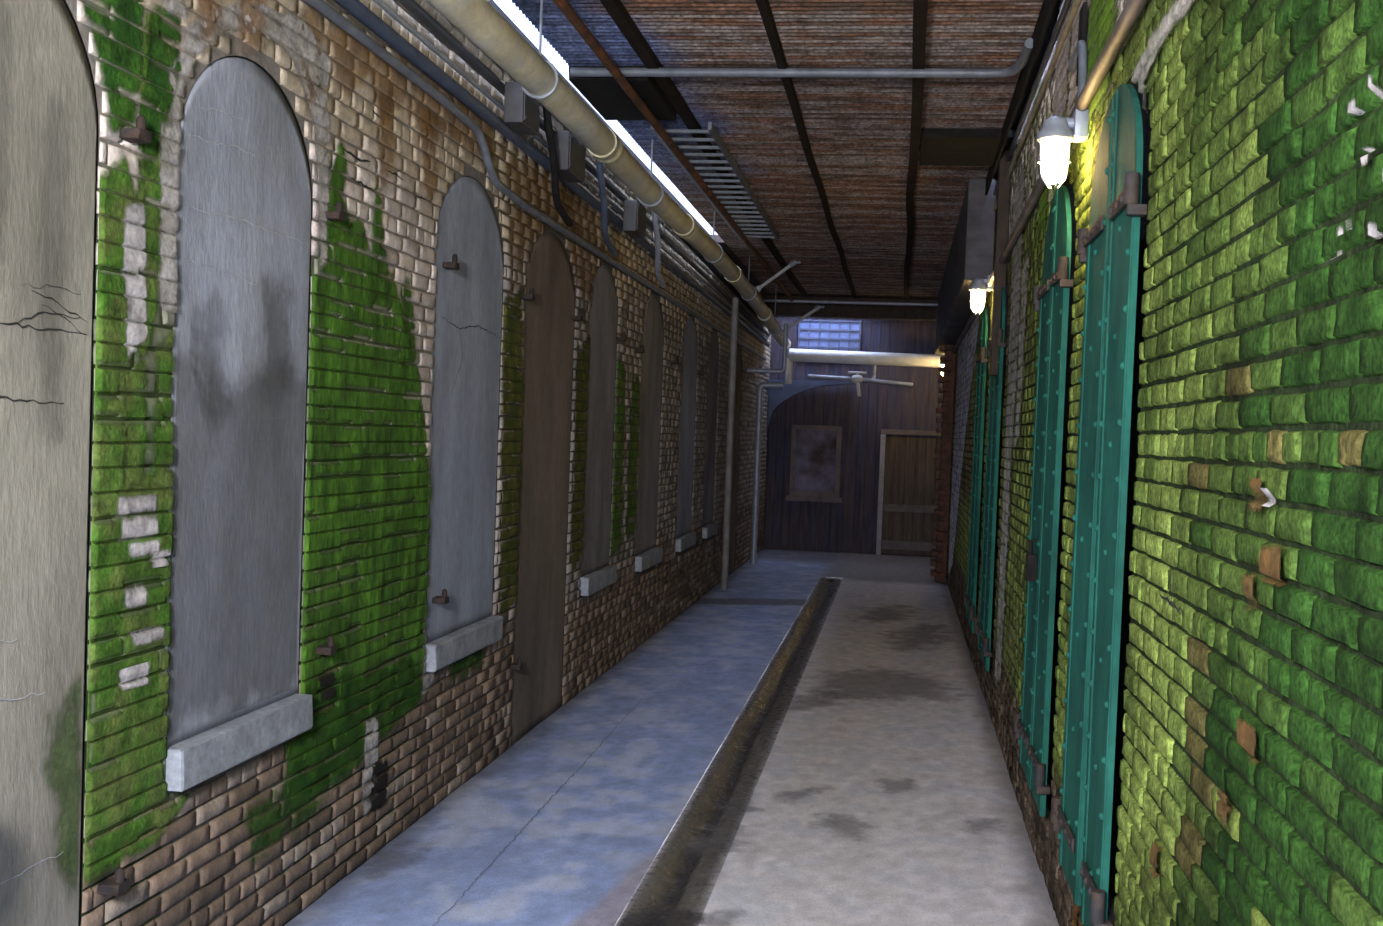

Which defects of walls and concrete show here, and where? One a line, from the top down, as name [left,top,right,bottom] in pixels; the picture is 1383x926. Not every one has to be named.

peeling [1367,74,1383,102]
peeling [1348,100,1363,114]
peeling [1368,224,1382,237]
crack [0,283,87,335]
crack [0,395,64,404]
spalling [1249,477,1274,511]
spalling [1242,546,1285,610]
spalling [1237,719,1258,760]
water stain [44,681,81,889]
spalling [1216,788,1232,825]
crack [0,852,63,884]